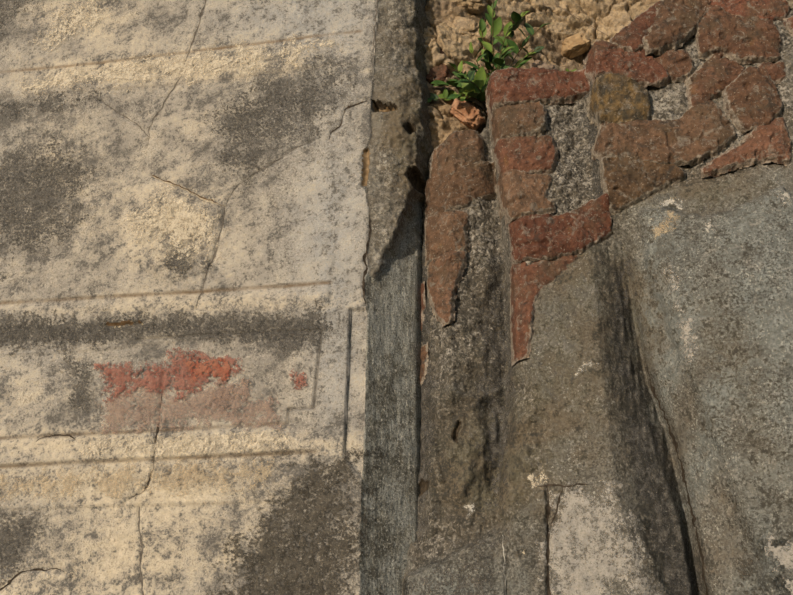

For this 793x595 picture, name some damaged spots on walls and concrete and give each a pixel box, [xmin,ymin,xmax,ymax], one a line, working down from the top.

crack [103,0,206,147]
damp [0,34,358,194]
damp [0,128,103,281]
crack [151,101,366,306]
crack [0,568,67,590]
crack [129,389,163,595]
damp [0,298,334,418]
peeling [93,347,282,434]
damp [81,429,388,595]
crack [539,483,590,595]
damp [528,257,701,595]
crack [645,367,708,595]